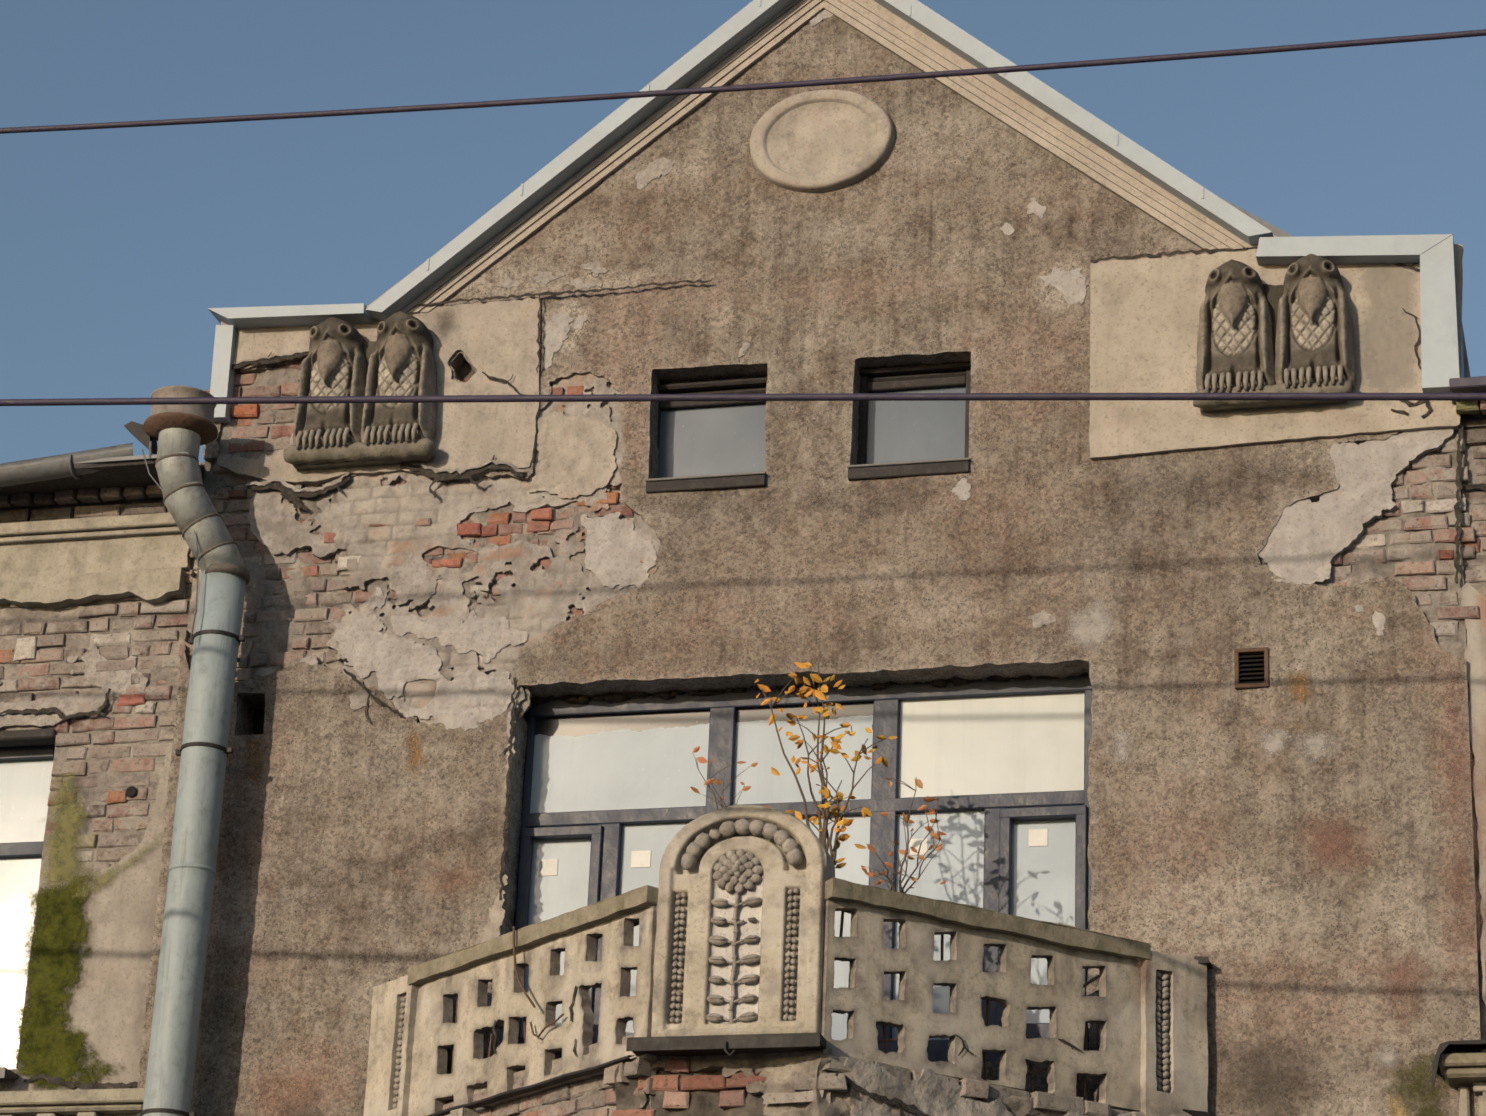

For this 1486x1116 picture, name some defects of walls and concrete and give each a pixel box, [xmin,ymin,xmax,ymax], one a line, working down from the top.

crack [413,279,712,395]
flaking render [1038,267,1087,308]
crack [1395,263,1420,271]
crack [1391,308,1486,584]
flaking render [203,313,660,771]
flaking render [1258,428,1480,658]
flaking render [179,549,202,663]
flaking render [844,1058,1013,1116]